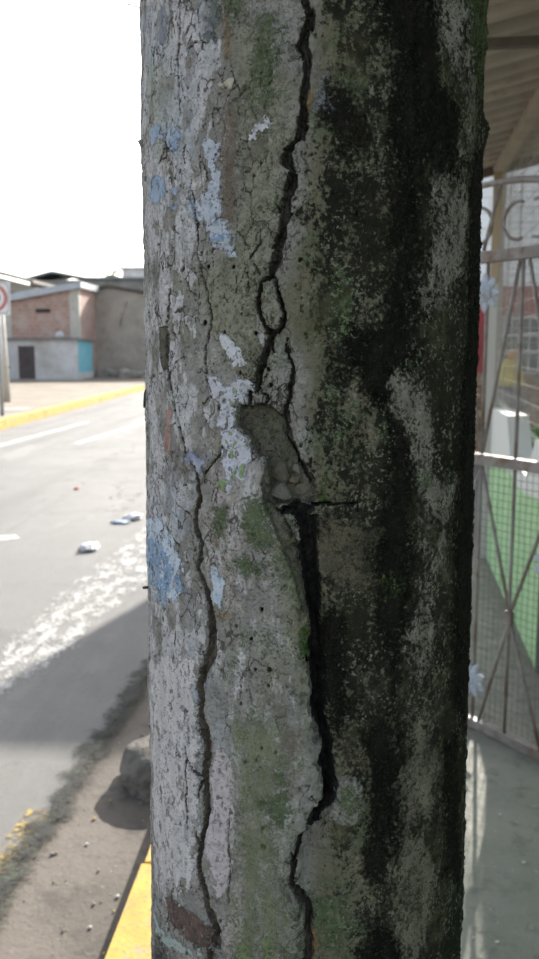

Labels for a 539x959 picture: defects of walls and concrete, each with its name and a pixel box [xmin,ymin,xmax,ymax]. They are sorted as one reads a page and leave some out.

peeling [138,123,181,155]
crack [165,291,173,394]
peeling [143,136,237,258]
crack [191,194,213,374]
peeling [143,512,186,608]
spalling [183,333,317,612]
crack [247,0,358,959]
water stain [309,0,487,959]
crack [177,417,231,959]